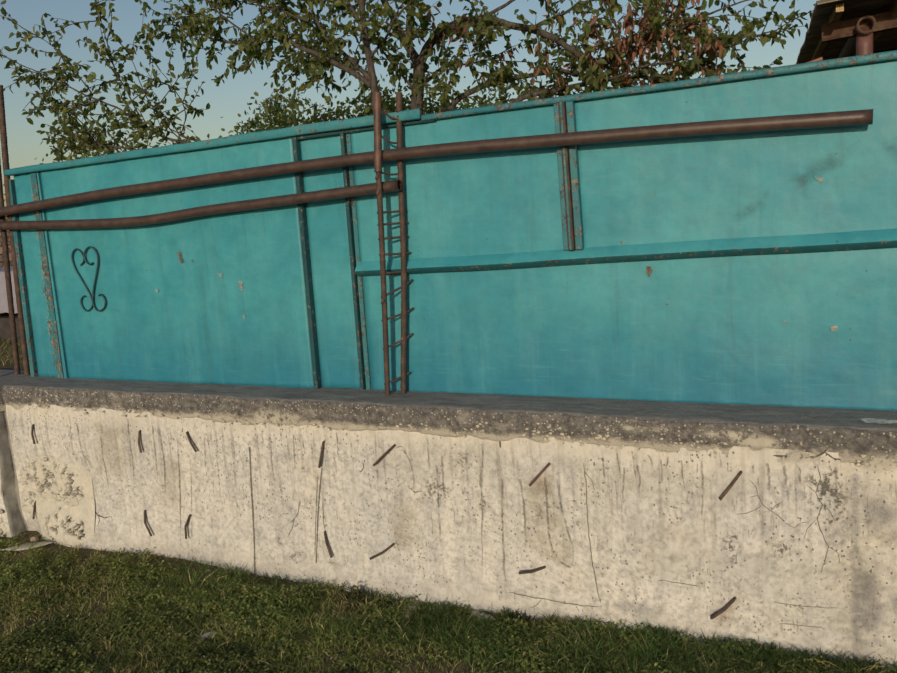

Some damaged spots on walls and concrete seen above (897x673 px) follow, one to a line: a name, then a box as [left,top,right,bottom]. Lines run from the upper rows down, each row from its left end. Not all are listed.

corrosion [32,185,61,371]
spalling [20,455,94,524]
crack [741,448,841,572]